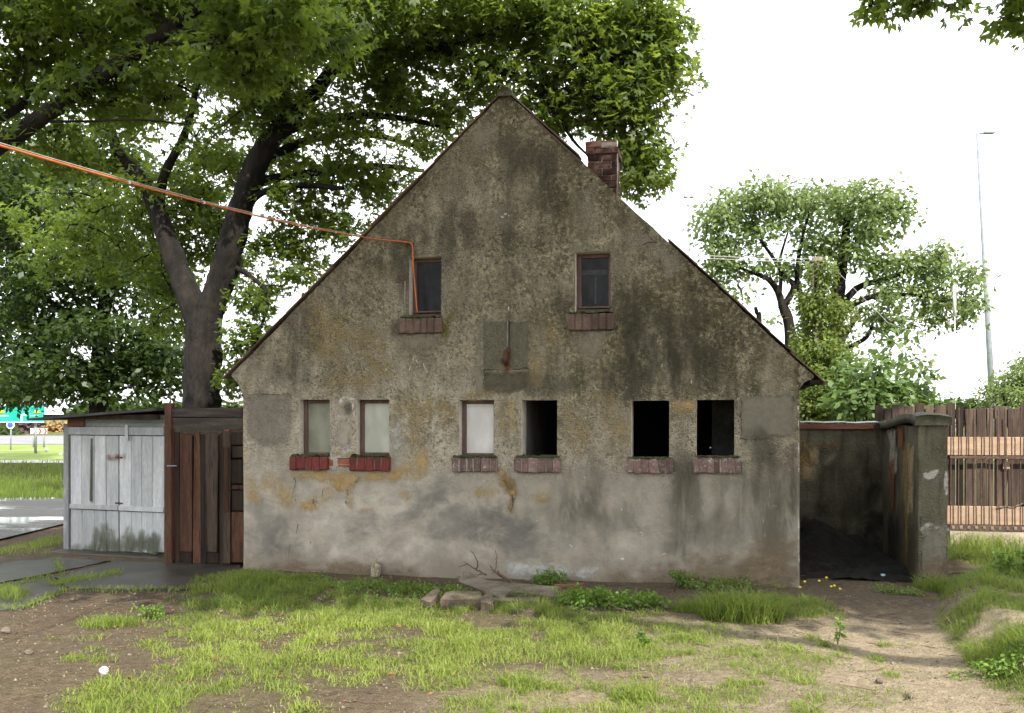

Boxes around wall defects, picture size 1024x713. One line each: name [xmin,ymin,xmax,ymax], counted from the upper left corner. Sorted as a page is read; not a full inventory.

spalling [923,470,948,495]
leakage [681,503,796,588]